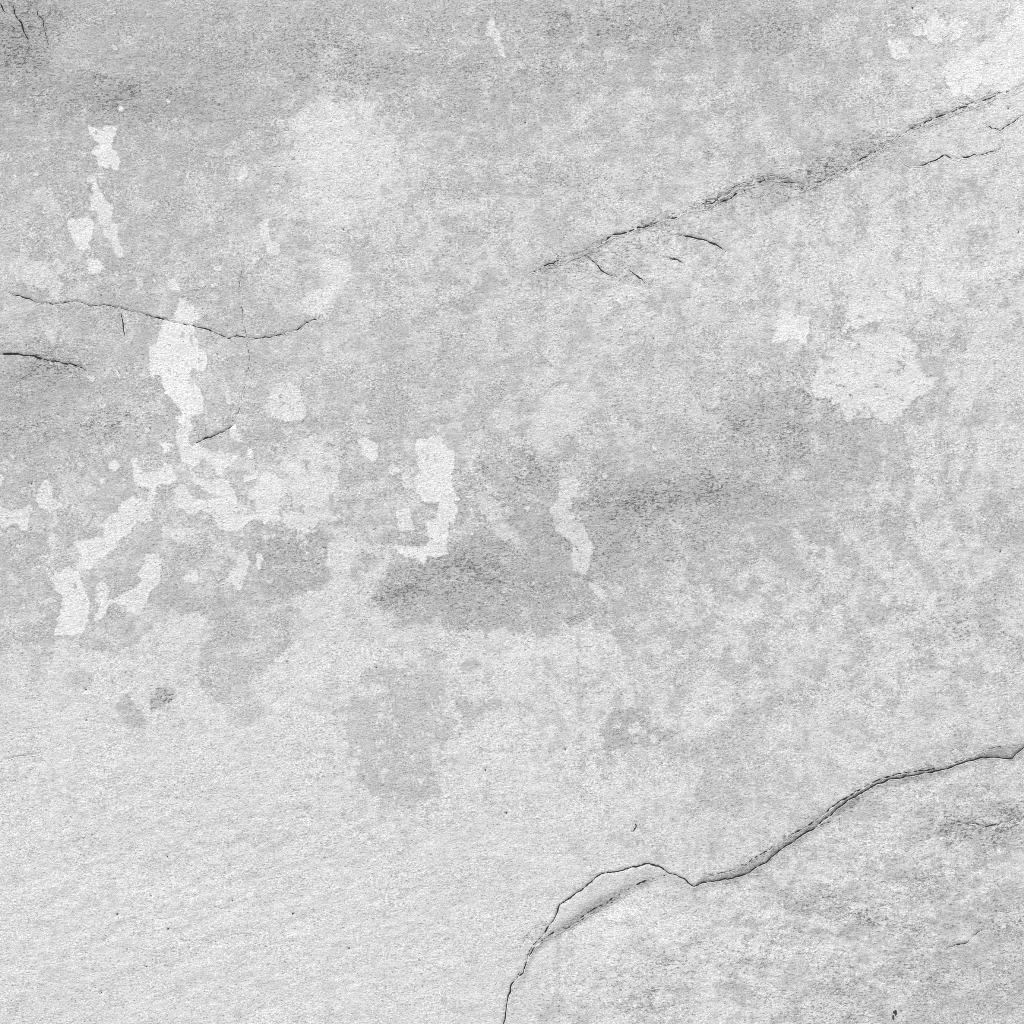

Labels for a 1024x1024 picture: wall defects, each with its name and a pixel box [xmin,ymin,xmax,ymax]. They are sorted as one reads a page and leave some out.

crack [528,80,1024,283]
crack [0,257,320,446]
crack [502,744,1024,1024]